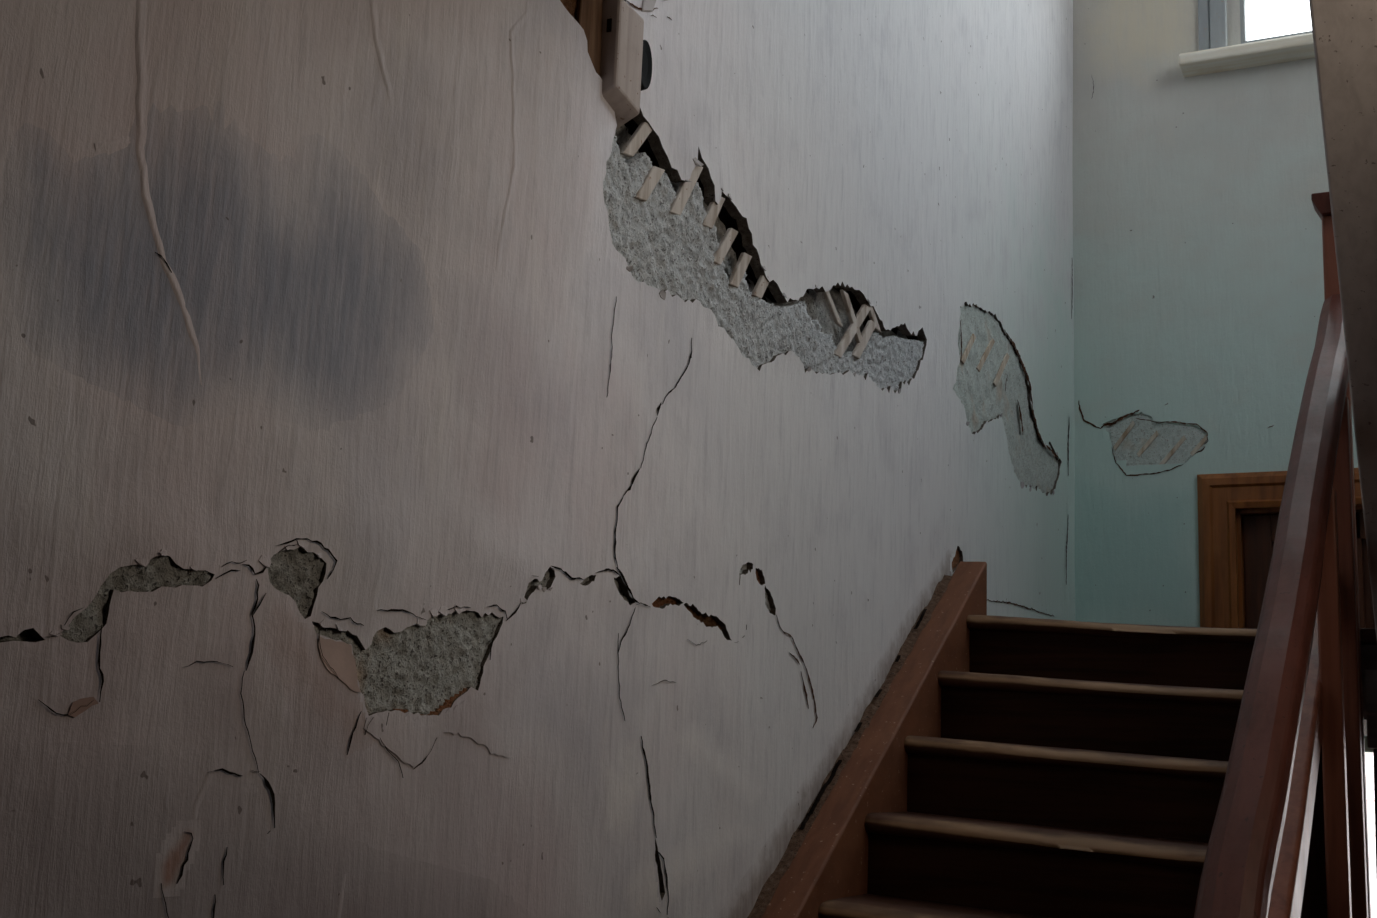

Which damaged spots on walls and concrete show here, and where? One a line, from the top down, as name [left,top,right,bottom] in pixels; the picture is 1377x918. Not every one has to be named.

spalling [560,0,603,76]
spalling [603,122,924,394]
crack [607,296,617,396]
spalling [953,304,1062,495]
spalling [1078,401,1209,476]
crack [0,608,82,642]
spalling [49,549,211,717]
crack [182,560,275,834]
spalling [258,538,511,767]
crack [347,711,437,777]
crack [506,338,692,915]
crack [161,832,193,918]